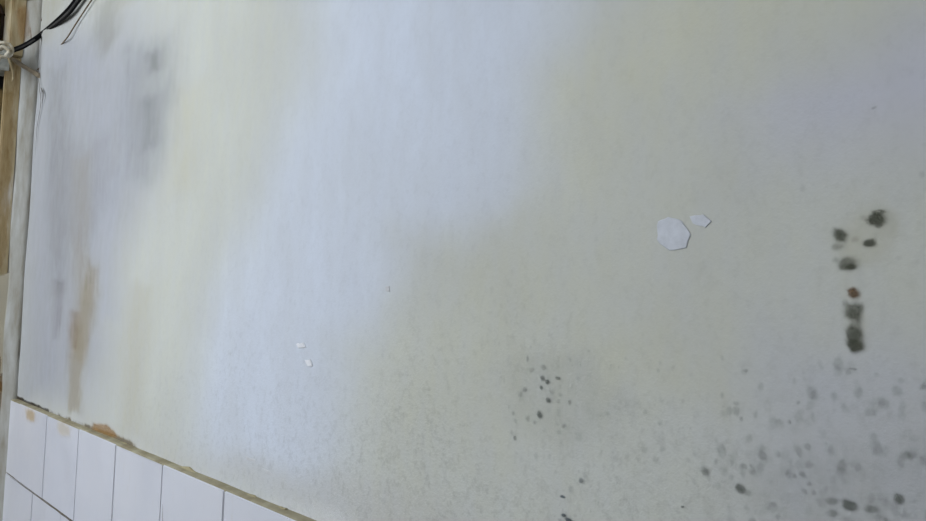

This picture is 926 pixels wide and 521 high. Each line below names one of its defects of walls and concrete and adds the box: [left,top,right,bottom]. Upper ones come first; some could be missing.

water stain [866,209,885,228]
water stain [833,228,847,241]
water stain [839,257,856,270]
water stain [845,287,864,353]
water stain [826,498,877,517]